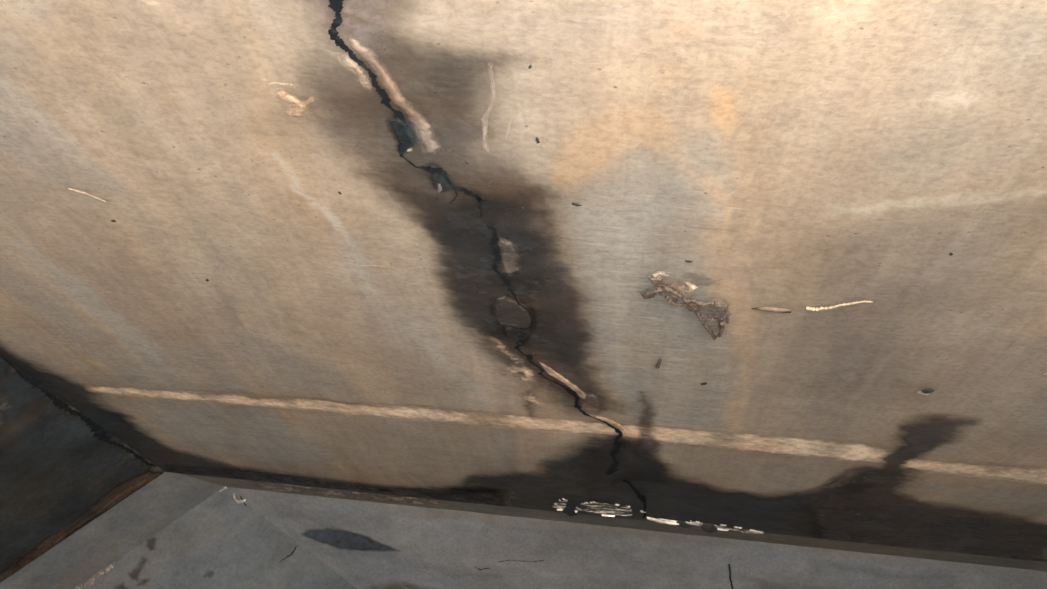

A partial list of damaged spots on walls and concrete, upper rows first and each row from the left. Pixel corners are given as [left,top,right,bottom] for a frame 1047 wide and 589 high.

peeling [340,36,453,193]
leakage [318,0,610,414]
crack [328,0,647,518]
crack [0,356,168,472]
leakage [0,347,1047,573]